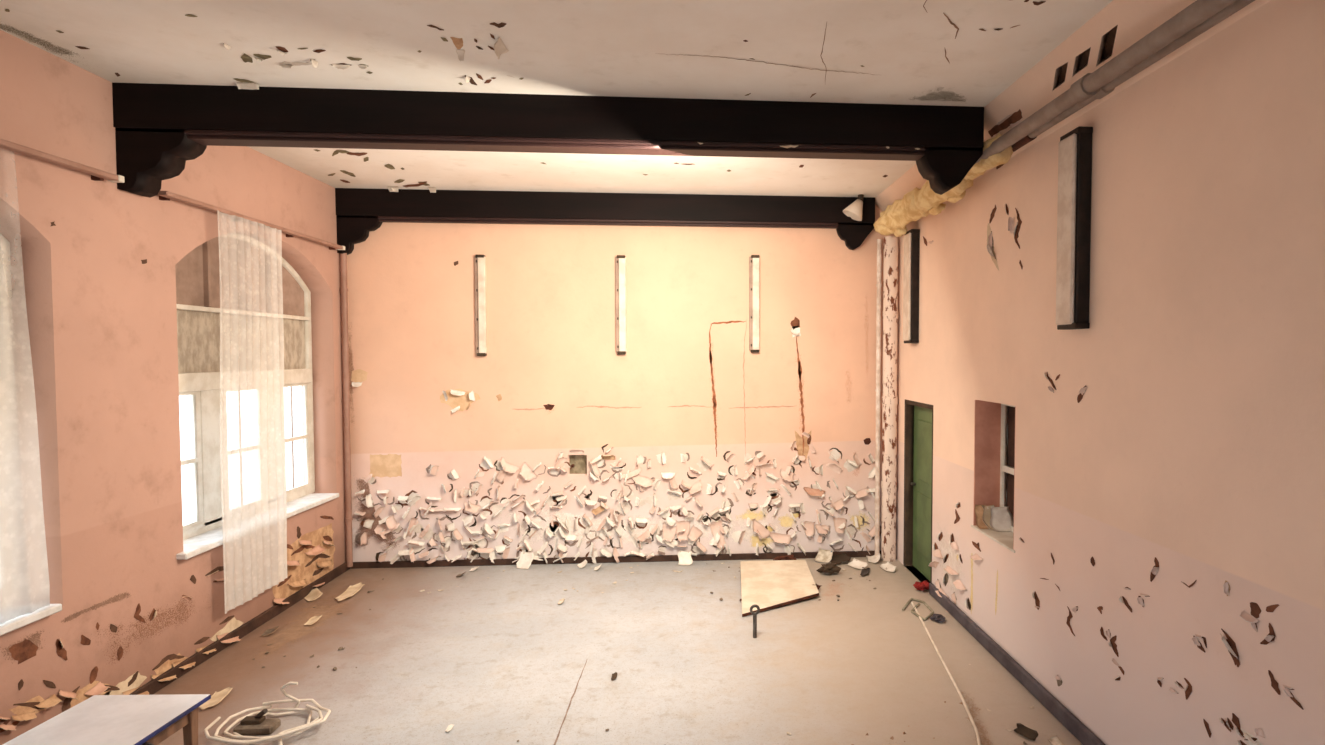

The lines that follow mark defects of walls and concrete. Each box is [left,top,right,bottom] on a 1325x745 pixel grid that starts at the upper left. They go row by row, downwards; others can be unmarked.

peeling [234,78,259,90]
peeling [223,43,373,74]
peeling [427,22,523,85]
crack [923,0,1046,62]
peeling [986,204,1023,270]
peeling [354,431,896,577]
flaking render [272,515,335,605]
peeling [929,502,1024,613]
flaking render [0,615,243,733]
peeling [1192,629,1240,667]
peeling [1240,602,1280,645]
peeling [1203,713,1266,745]